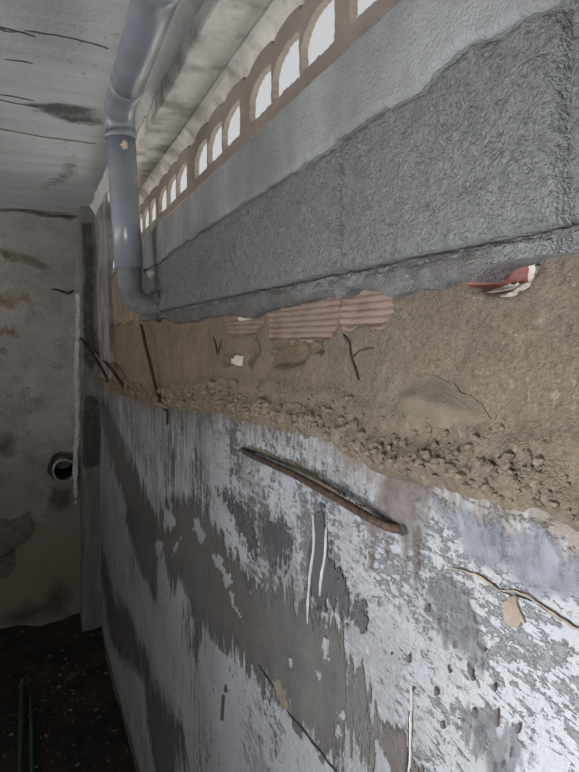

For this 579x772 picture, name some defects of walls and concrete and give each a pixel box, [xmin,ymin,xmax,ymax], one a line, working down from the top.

crack [0,27,108,49]
crack [0,94,100,144]
spalling [468,260,545,297]
flaking render [223,290,395,370]
spalling [140,324,169,425]
corrosion [240,447,426,588]
peeling [100,394,424,772]
crack [452,567,579,630]
crack [258,665,337,772]